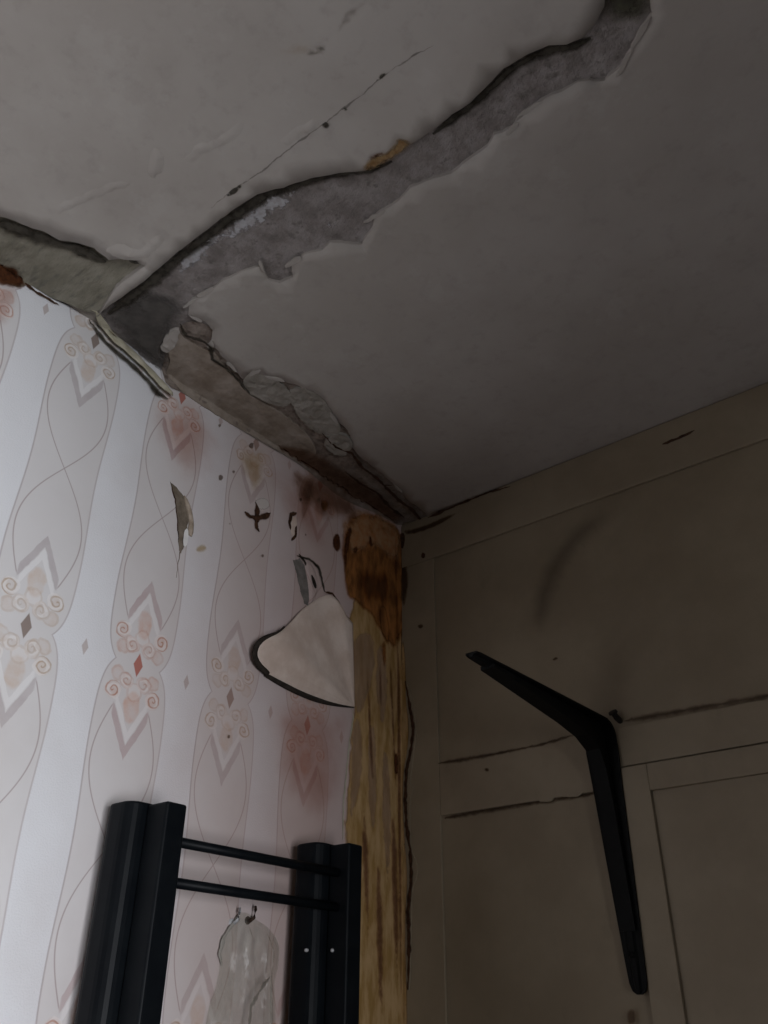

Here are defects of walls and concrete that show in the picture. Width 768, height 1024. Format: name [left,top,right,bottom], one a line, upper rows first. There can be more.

flaking render [0,0,651,548]
peeling [252,595,355,708]
crack [441,736,569,763]
crack [446,793,594,818]